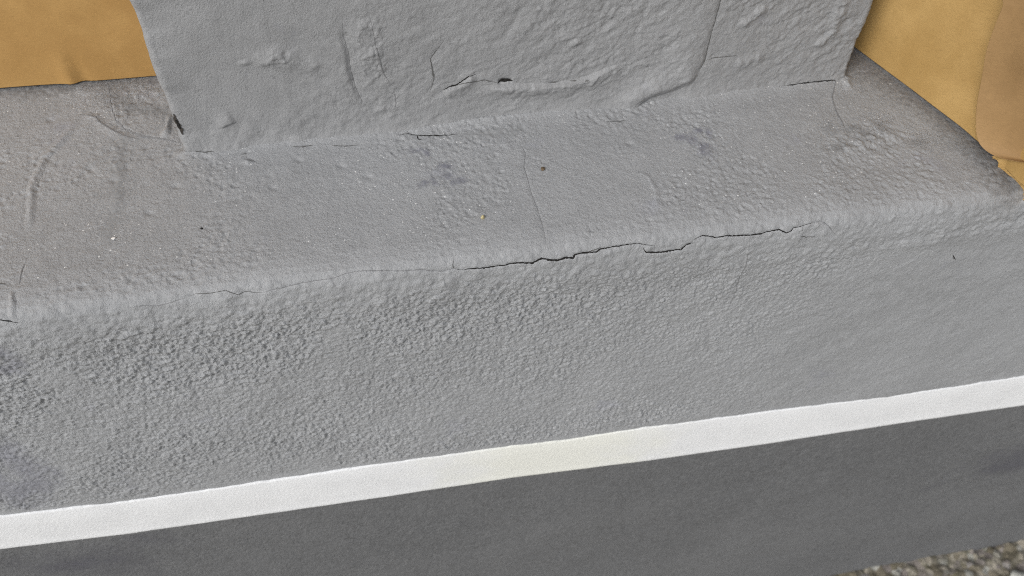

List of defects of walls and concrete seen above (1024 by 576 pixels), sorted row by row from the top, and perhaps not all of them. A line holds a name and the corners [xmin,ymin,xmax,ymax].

crack [430,43,497,90]
crack [778,80,846,130]
crack [132,143,834,312]